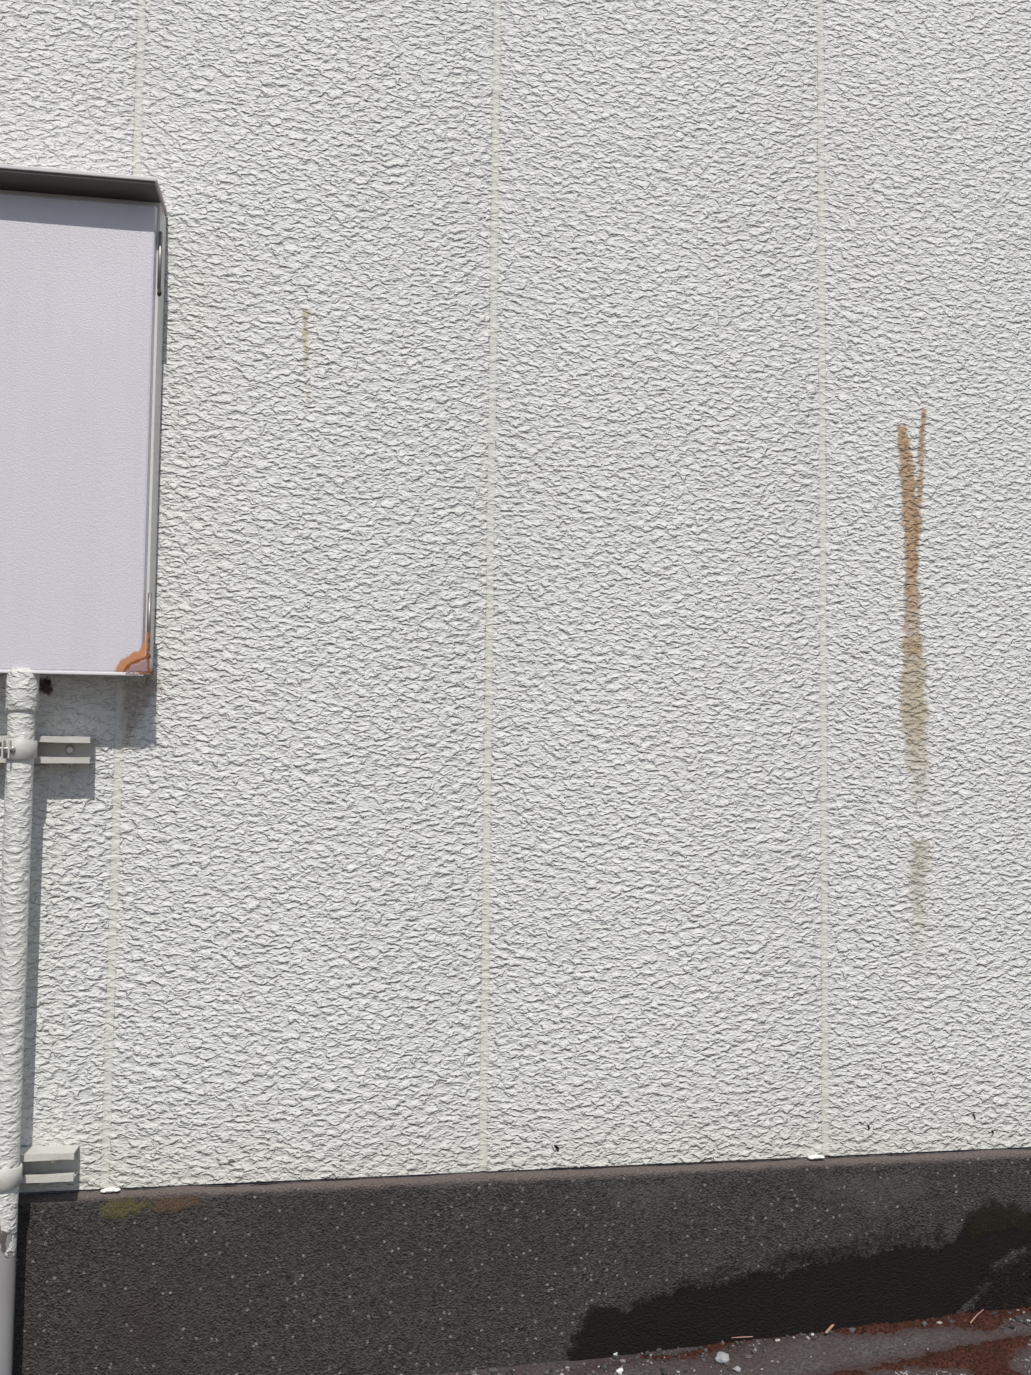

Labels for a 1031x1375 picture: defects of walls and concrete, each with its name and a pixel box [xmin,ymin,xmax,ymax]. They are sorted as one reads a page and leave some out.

rust [898,409,926,734]
water stain [567,1198,1031,1361]